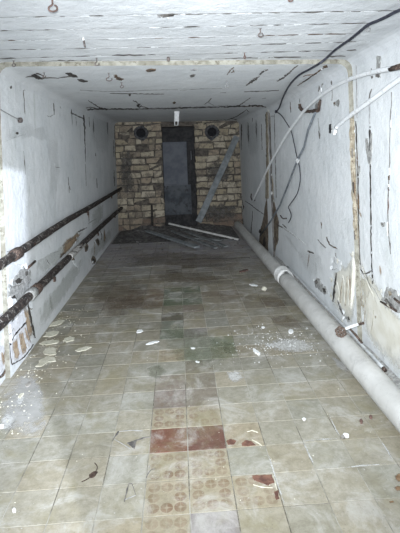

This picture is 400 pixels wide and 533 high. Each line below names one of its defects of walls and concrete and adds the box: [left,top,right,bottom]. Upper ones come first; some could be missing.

peeling [60,219,96,259]
spalling [7,260,36,309]
peeling [313,251,400,366]
corrosion [0,324,32,373]